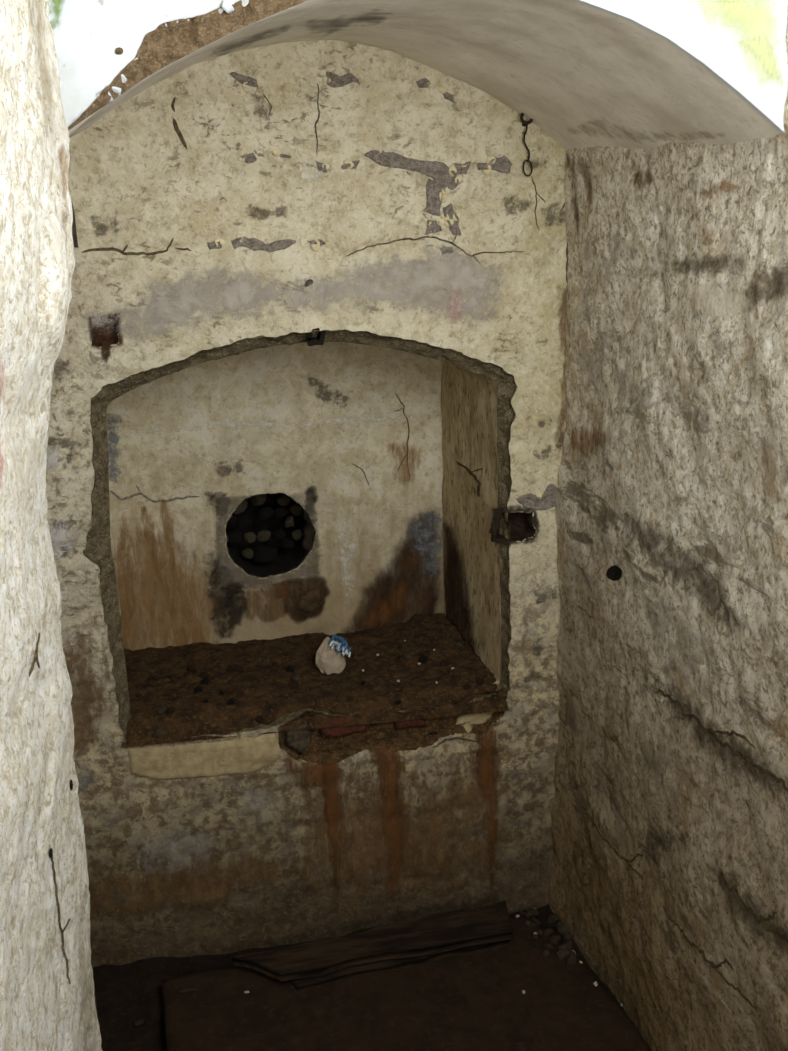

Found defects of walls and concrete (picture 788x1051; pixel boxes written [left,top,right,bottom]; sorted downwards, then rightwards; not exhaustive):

spalling [68,0,309,131]
crack [81,237,192,255]
flaking render [207,234,326,252]
flaking render [316,149,512,255]
crack [347,235,524,262]
spalling [90,314,123,362]
corrosion [146,500,204,646]
corrosion [287,760,342,885]
corrosion [369,747,405,889]
corrosion [476,722,499,880]
crack [655,689,788,791]
crack [51,855,71,984]